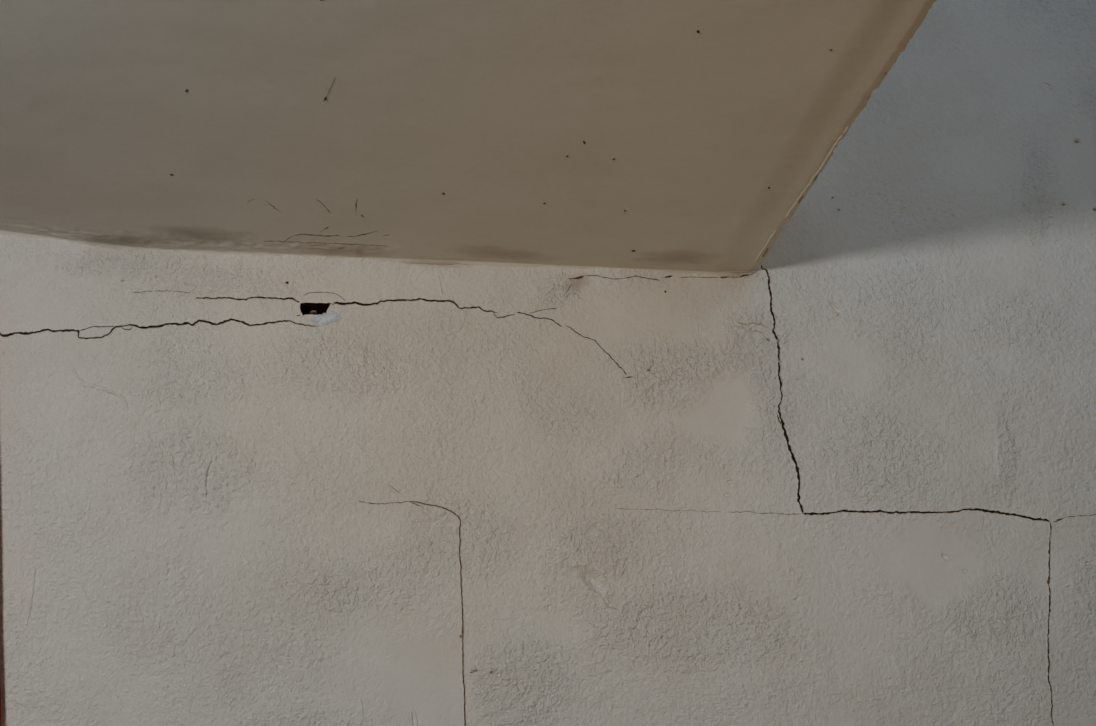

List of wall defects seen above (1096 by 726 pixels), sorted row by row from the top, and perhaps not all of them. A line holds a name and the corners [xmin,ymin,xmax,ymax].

spalling [297,300,341,326]
crack [0,264,1096,726]